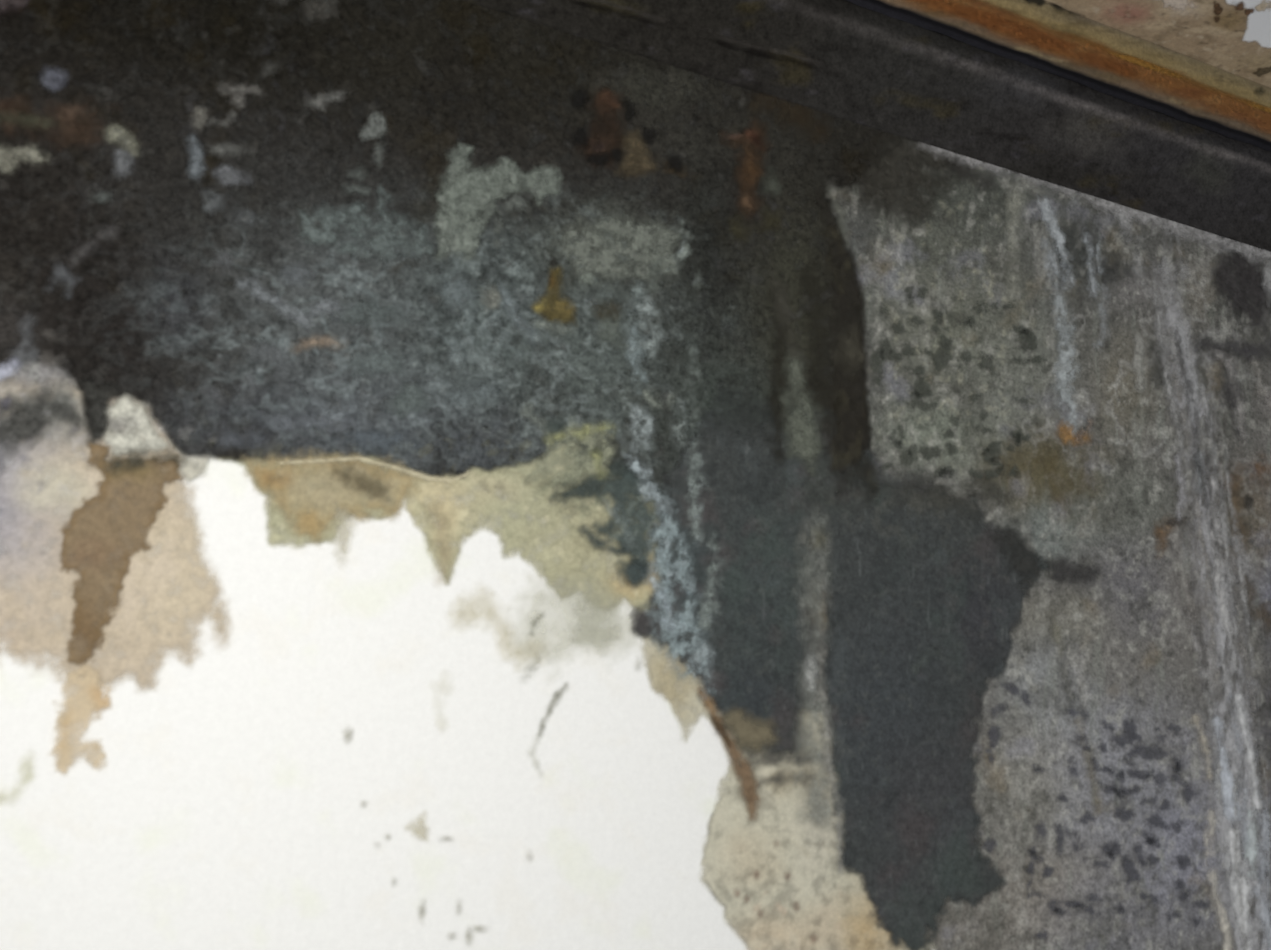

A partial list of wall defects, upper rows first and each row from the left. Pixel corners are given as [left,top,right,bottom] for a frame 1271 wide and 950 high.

peeling [1045,0,1271,88]
leakage [959,154,1009,172]
peeling [239,282,396,347]
leakage [0,0,975,538]
peeling [0,318,225,688]
leakage [61,444,182,664]
peeling [221,406,662,612]
leakage [1053,559,1098,583]
leakage [53,666,110,773]
leakage [562,411,1049,950]